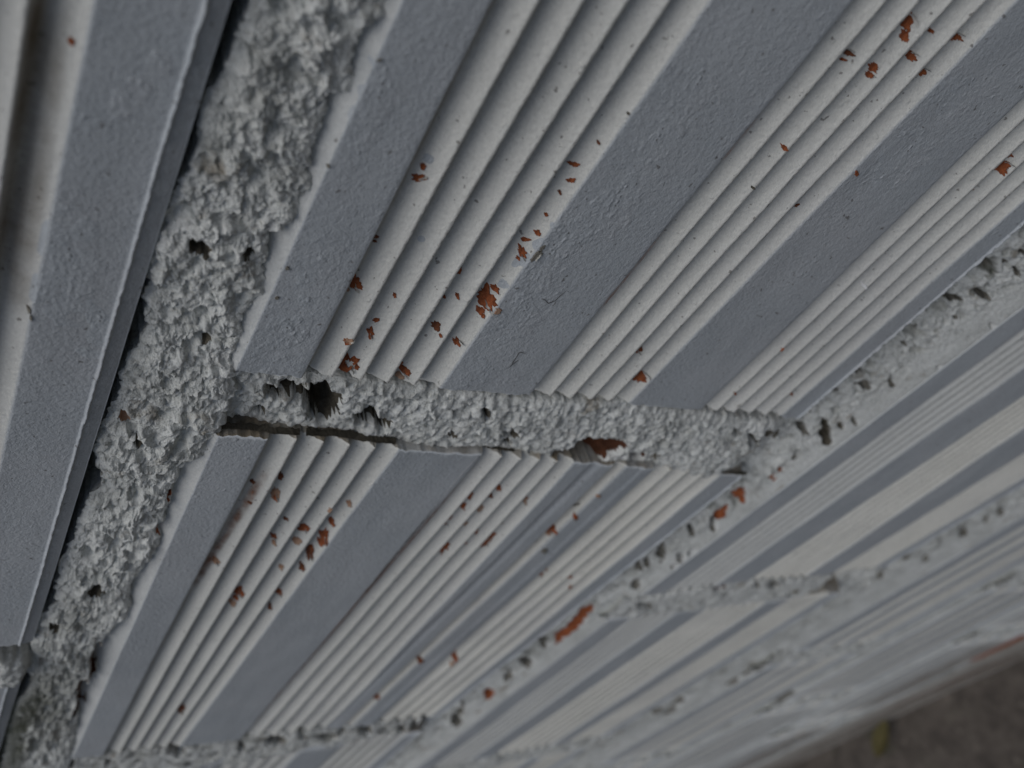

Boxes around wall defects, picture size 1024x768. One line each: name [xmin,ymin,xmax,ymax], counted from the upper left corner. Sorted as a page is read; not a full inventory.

crack [222,422,396,444]
crack [484,444,514,452]
crack [712,468,747,476]